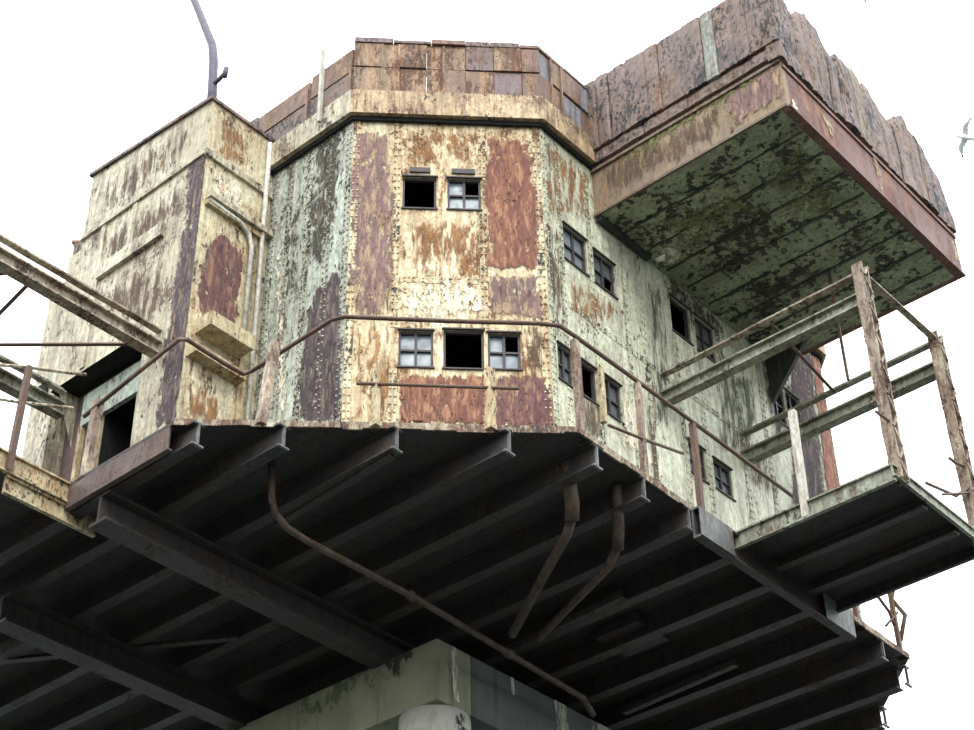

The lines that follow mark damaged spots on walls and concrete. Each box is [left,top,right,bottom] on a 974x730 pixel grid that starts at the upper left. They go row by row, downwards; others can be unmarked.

leakage [273,241,286,420]
peeling [272,130,544,421]
rust [545,107,734,327]